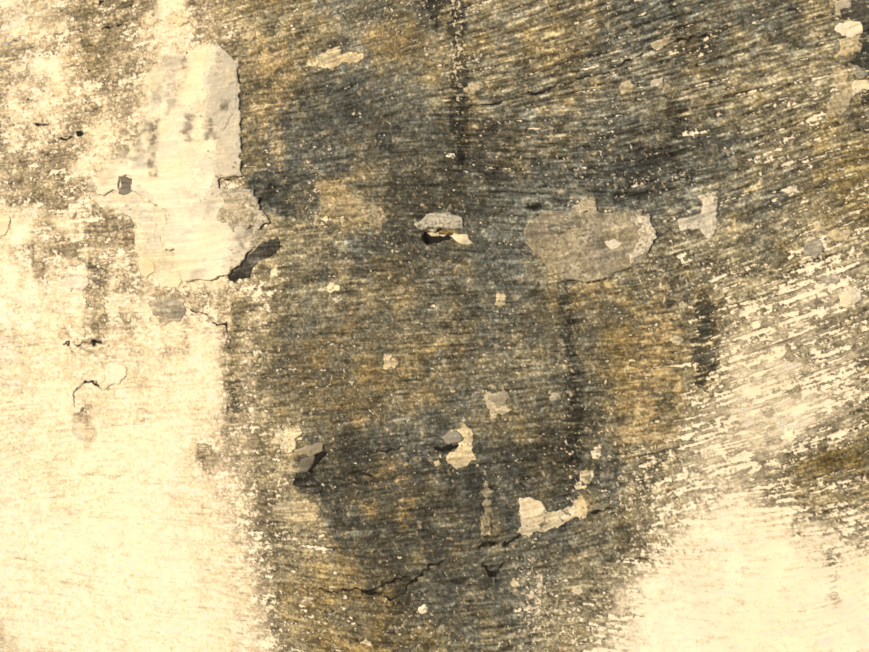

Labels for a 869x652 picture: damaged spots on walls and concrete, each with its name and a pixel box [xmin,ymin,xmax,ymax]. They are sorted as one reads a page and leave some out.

peeling [86,43,281,325]
spalling [414,212,474,245]
peeling [523,198,657,283]
leakage [189,0,869,652]
crack [73,380,101,402]
spalling [271,425,326,525]
spalling [434,417,476,469]
spalling [516,444,602,538]